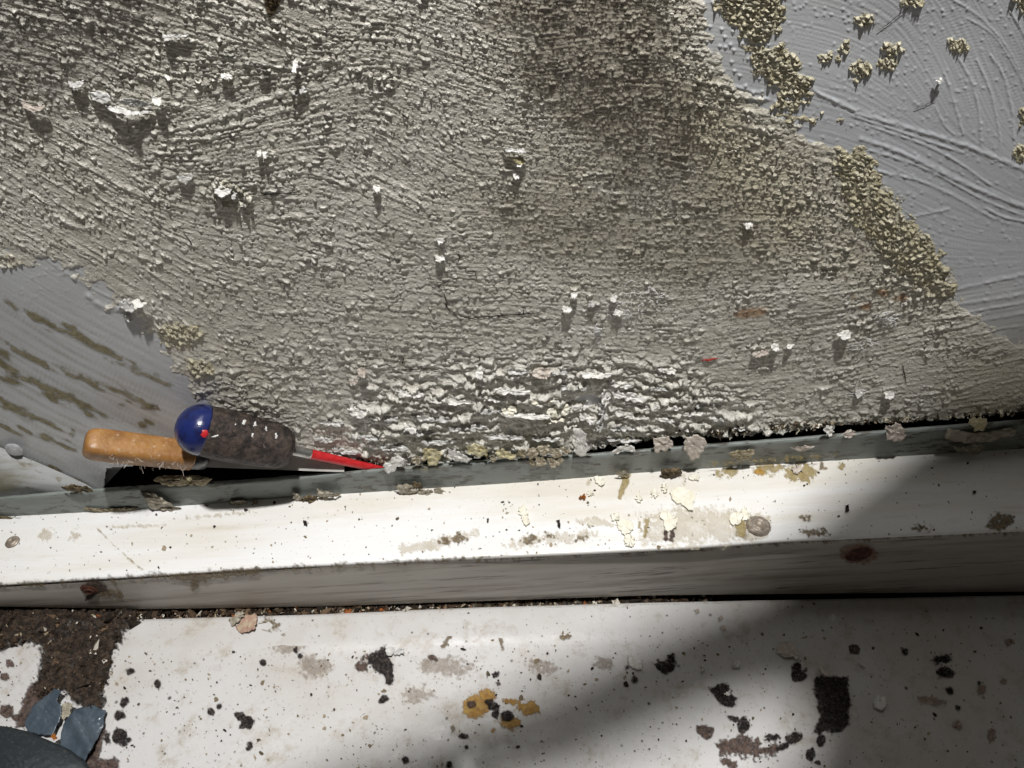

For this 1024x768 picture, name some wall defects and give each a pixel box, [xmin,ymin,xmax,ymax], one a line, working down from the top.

peeling [853,13,875,28]
peeling [900,0,925,9]
peeling [712,0,847,130]
peeling [817,39,905,84]
peeling [947,37,970,54]
peeling [1012,143,1024,163]
peeling [829,145,958,300]
crack [429,250,536,320]
peeling [117,298,148,322]
peeling [157,321,215,379]
peeling [192,208,1024,532]
spalling [103,465,325,488]